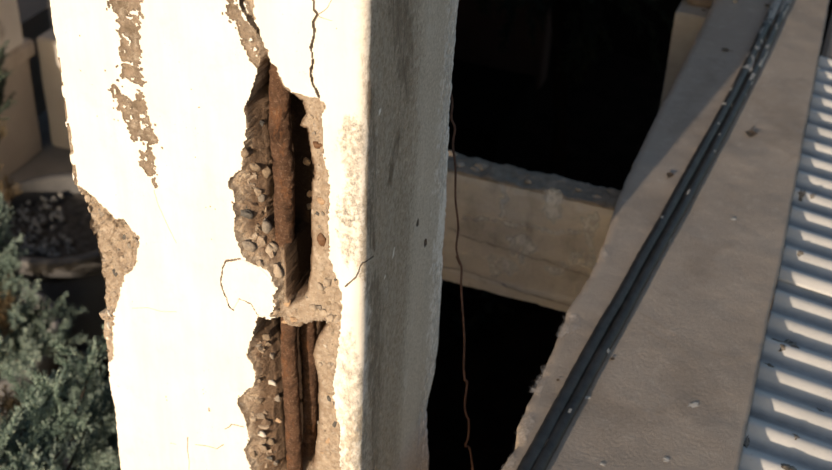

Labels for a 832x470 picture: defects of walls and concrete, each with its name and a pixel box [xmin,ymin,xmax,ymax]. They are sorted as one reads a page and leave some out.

peeling [104,0,163,189]
crack [309,0,332,98]
spalling [64,98,140,362]
crack [220,258,259,316]
spalling [220,0,366,470]